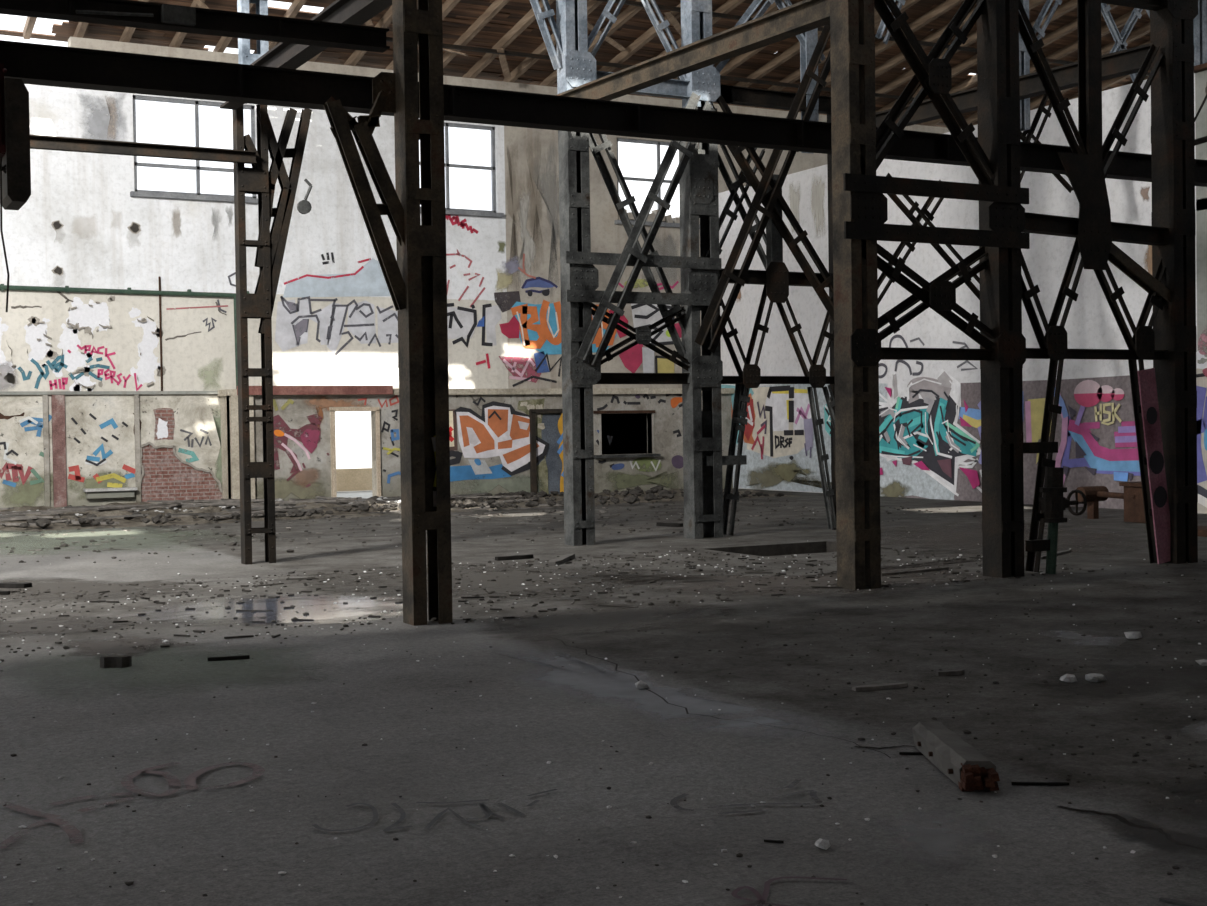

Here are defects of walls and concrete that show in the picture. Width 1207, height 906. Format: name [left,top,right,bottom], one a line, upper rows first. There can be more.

peeling [0,296,115,391]
peeling [129,307,166,395]
spalling [133,408,223,503]
crack [1058,806,1207,851]